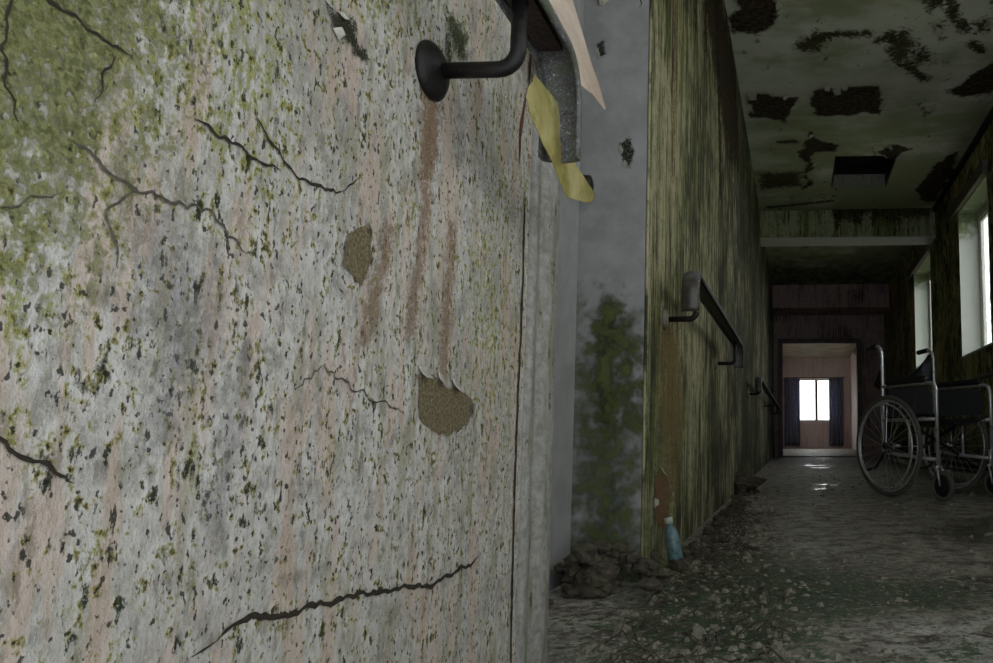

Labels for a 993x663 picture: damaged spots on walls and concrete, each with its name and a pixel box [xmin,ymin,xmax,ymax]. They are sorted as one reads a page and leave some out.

flaking render [728,0,782,36]
water stain [0,0,126,177]
flaking render [746,92,799,125]
flaking render [810,86,886,116]
flaking render [944,64,993,97]
peeling [617,137,635,169]
flaking render [797,132,840,189]
flaking render [913,152,958,204]
peeling [343,221,375,285]
peeling [417,365,477,436]
crack [192,557,478,657]